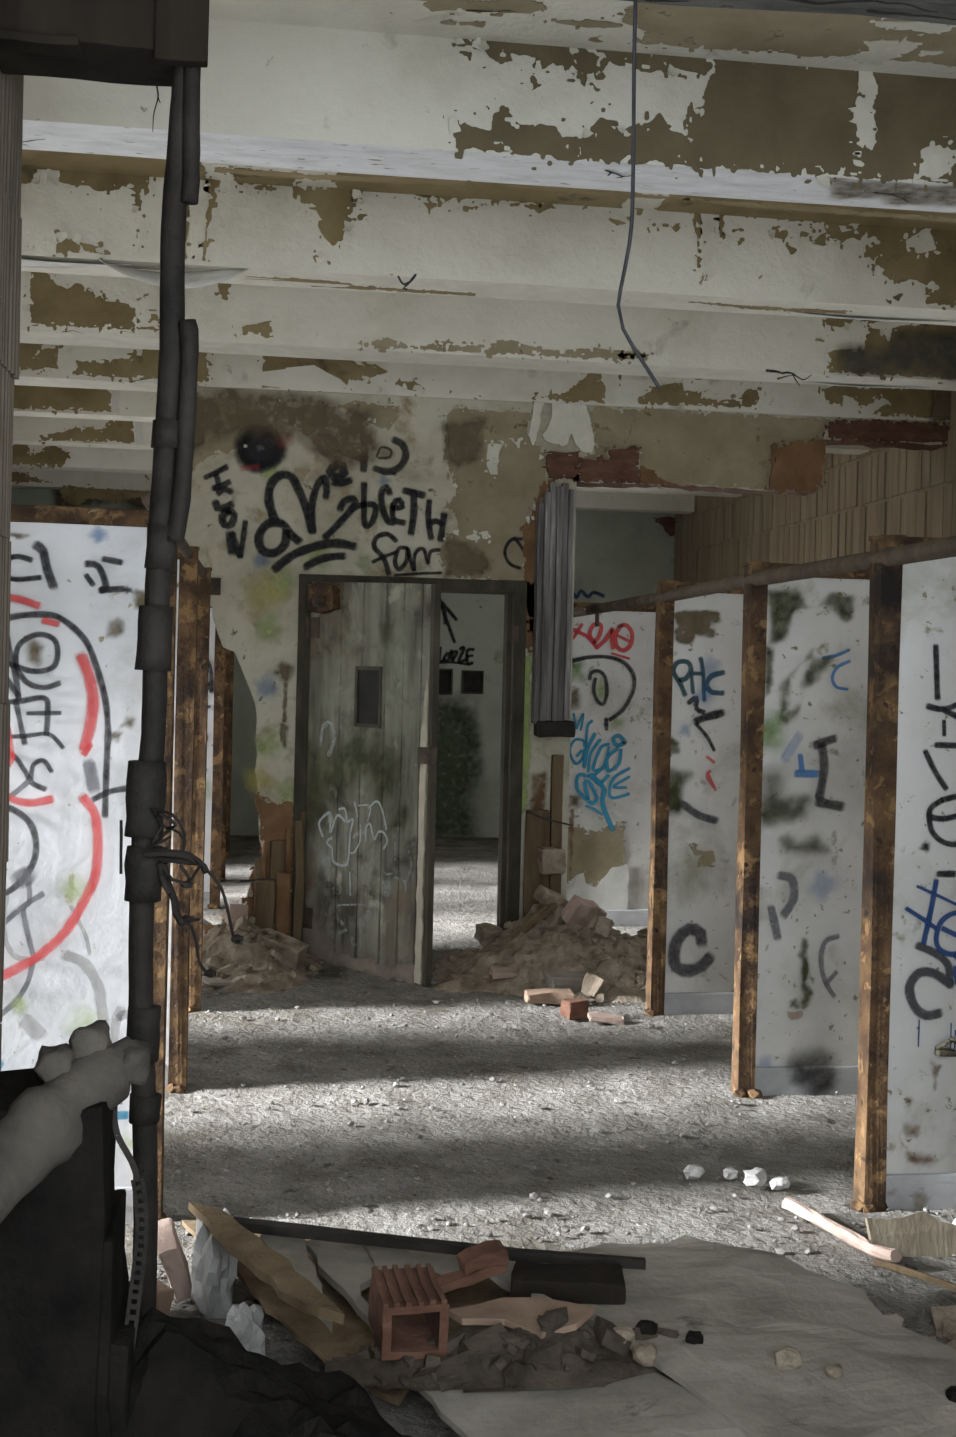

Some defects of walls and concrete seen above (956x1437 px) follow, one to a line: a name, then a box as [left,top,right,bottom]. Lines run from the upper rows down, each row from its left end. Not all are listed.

peeling [52,229,111,259]
peeling [21,149,166,248]
peeling [12,271,160,507]
peeling [185,0,956,653]
peeling [765,591,831,722]